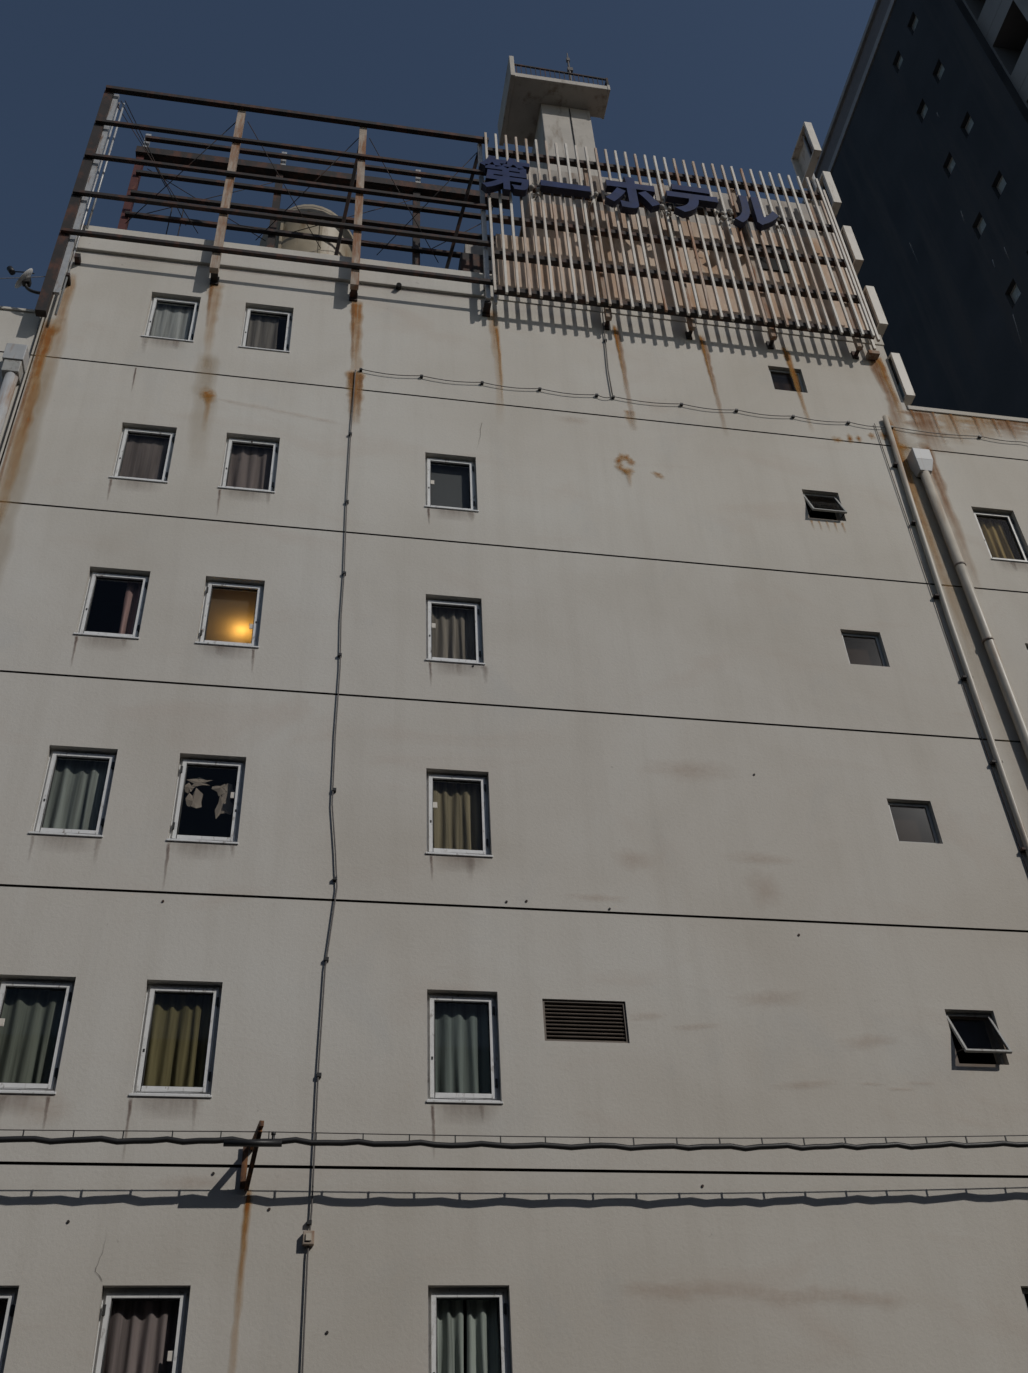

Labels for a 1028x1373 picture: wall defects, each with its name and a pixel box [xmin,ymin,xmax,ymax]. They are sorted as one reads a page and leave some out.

rust [352,303,362,347]
rust [614,327,625,372]
rust [700,337,713,377]
rust [2,324,58,471]
rust [348,372,363,404]
rust [973,416,1028,429]
rust [836,421,917,505]
rust [906,410,954,508]